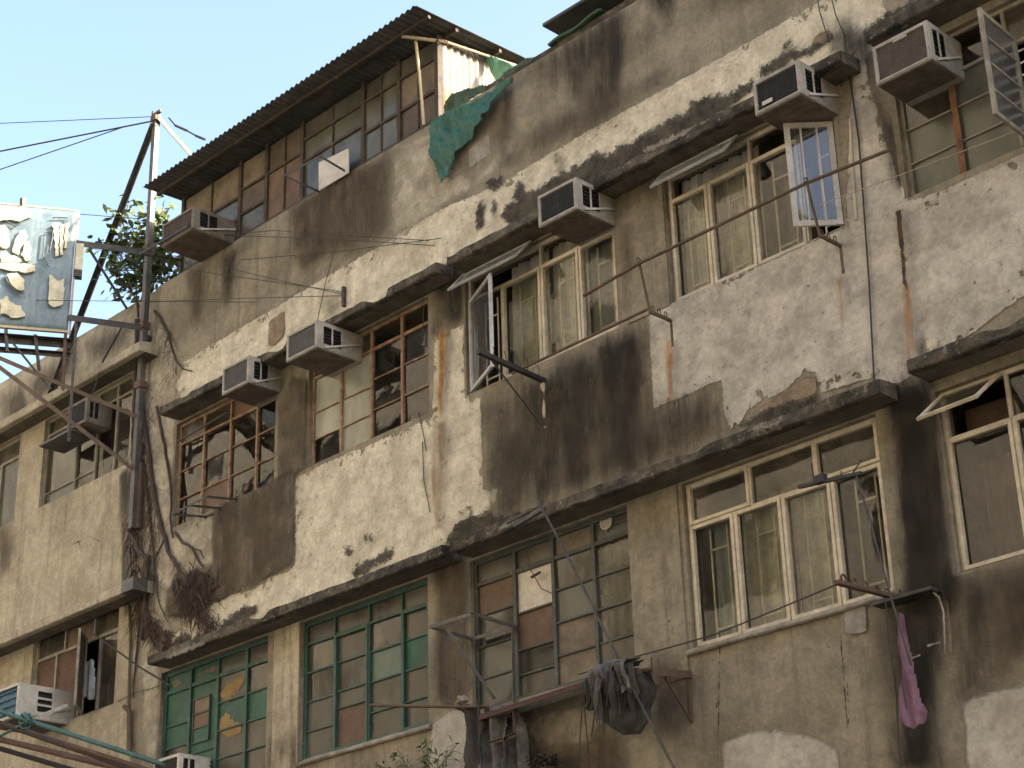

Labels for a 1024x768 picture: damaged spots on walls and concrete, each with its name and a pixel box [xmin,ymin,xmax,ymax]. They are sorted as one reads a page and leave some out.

peeling [171,0,1024,428]
water stain [475,0,921,231]
peeling [141,324,213,759]
peeling [167,324,498,659]
corrosion [433,422,444,527]
water stain [446,336,708,543]
water stain [890,380,956,703]
water stain [967,574,1024,657]
water stain [904,723,928,768]